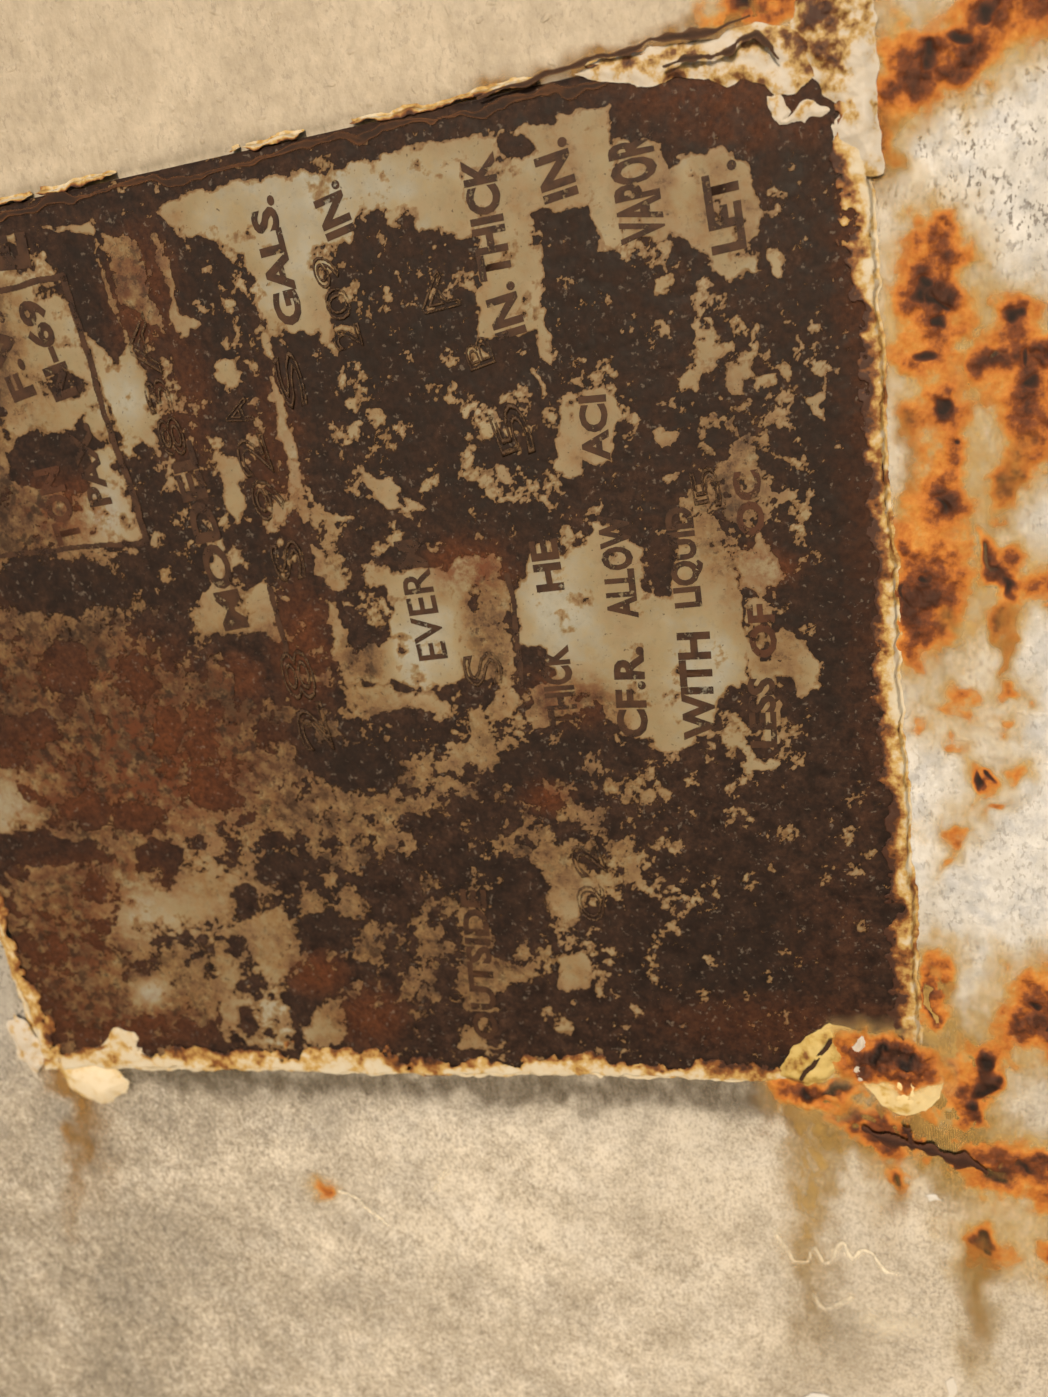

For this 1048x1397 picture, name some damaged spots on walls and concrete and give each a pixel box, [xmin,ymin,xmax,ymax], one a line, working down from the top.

corrosion [638,0,795,51]
corrosion [876,0,1048,172]
corrosion [0,45,618,222]
corrosion [885,207,1048,720]
corrosion [913,718,925,735]
corrosion [945,732,1031,811]
corrosion [941,825,970,867]
corrosion [766,948,1048,1319]
crack [861,1126,989,1175]